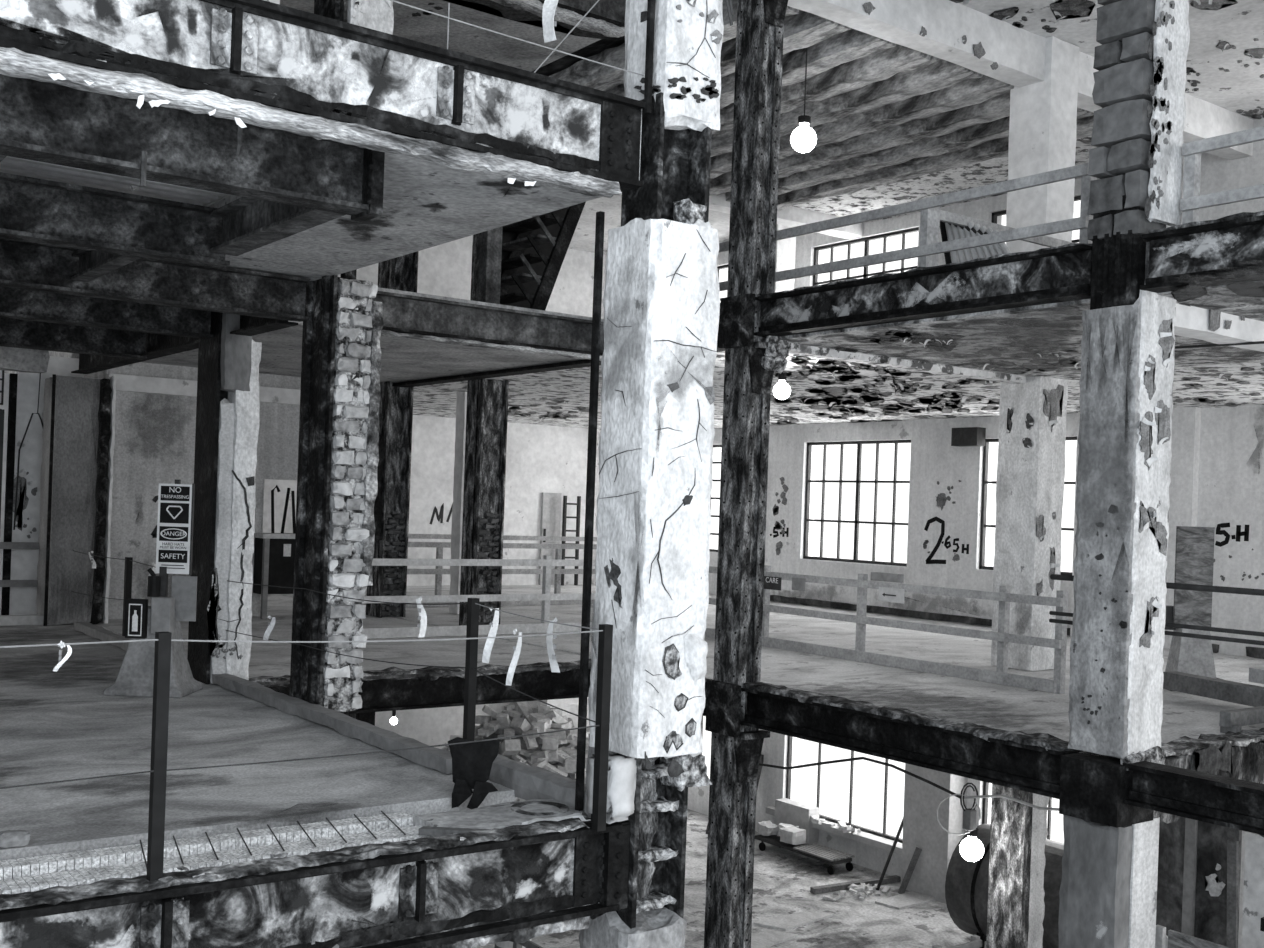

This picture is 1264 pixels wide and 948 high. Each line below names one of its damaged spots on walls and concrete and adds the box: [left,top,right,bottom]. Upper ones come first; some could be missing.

crack [666,0,716,78]
peeling [989,0,1095,33]
peeling [1149,1,1175,209]
peeling [1185,38,1264,92]
crack [599,229,717,624]
peeling [770,330,1081,448]
peeling [1138,318,1264,471]
crack [217,470,255,659]
peeling [1139,501,1167,556]
spalling [645,625,694,680]
peeling [1139,596,1163,648]
spalling [650,693,702,777]